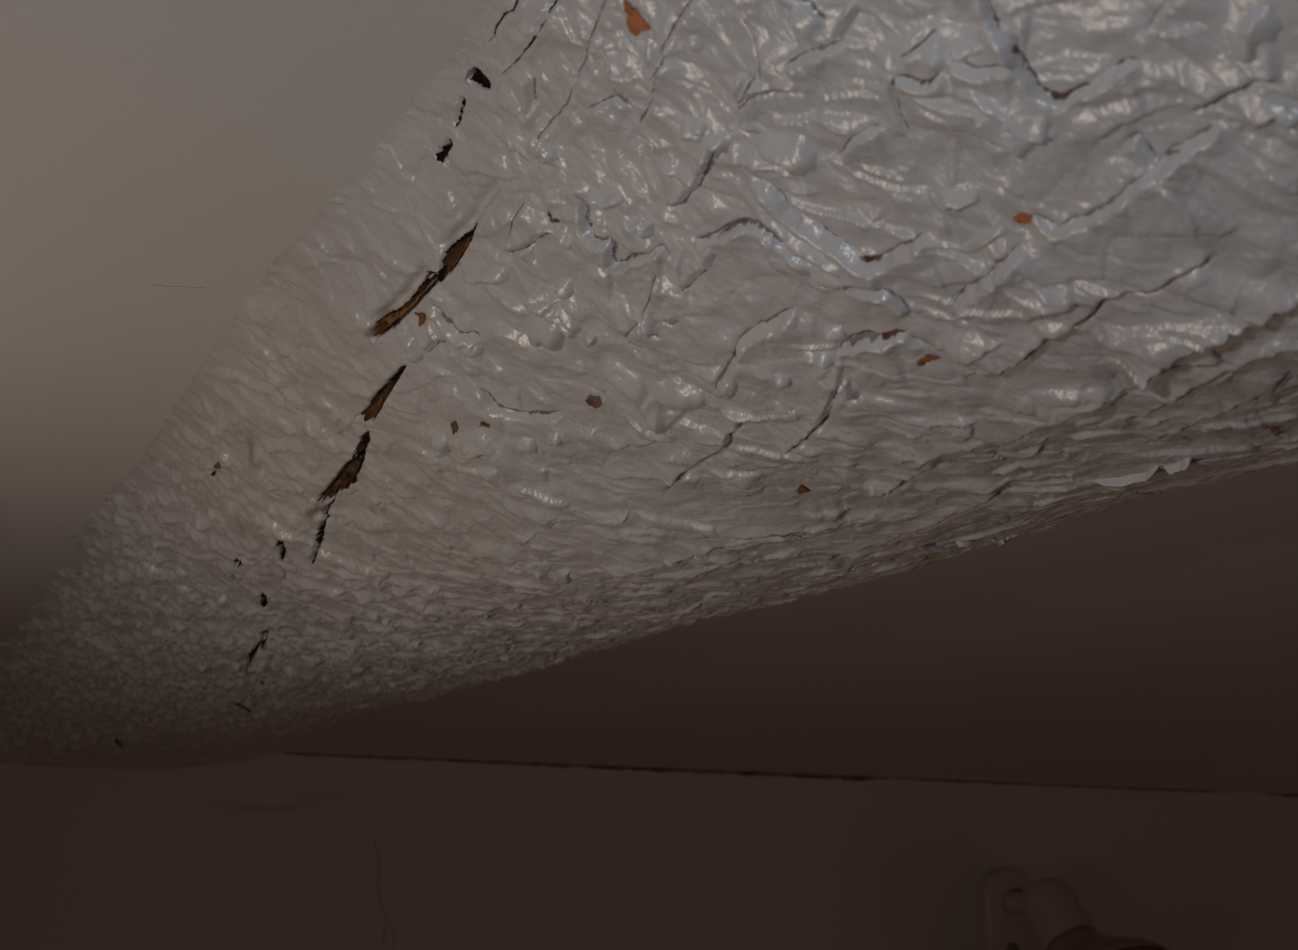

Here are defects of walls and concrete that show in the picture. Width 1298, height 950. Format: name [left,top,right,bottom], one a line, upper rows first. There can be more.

crack [436,98,466,163]
crack [489,0,518,41]
crack [500,0,691,152]
peeling [622,0,650,36]
crack [576,196,707,337]
crack [697,218,783,243]
crack [670,0,843,207]
crack [795,226,927,448]
crack [838,0,1091,154]
peeling [1013,213,1032,225]
crack [1034,80,1282,226]
crack [237,223,479,713]